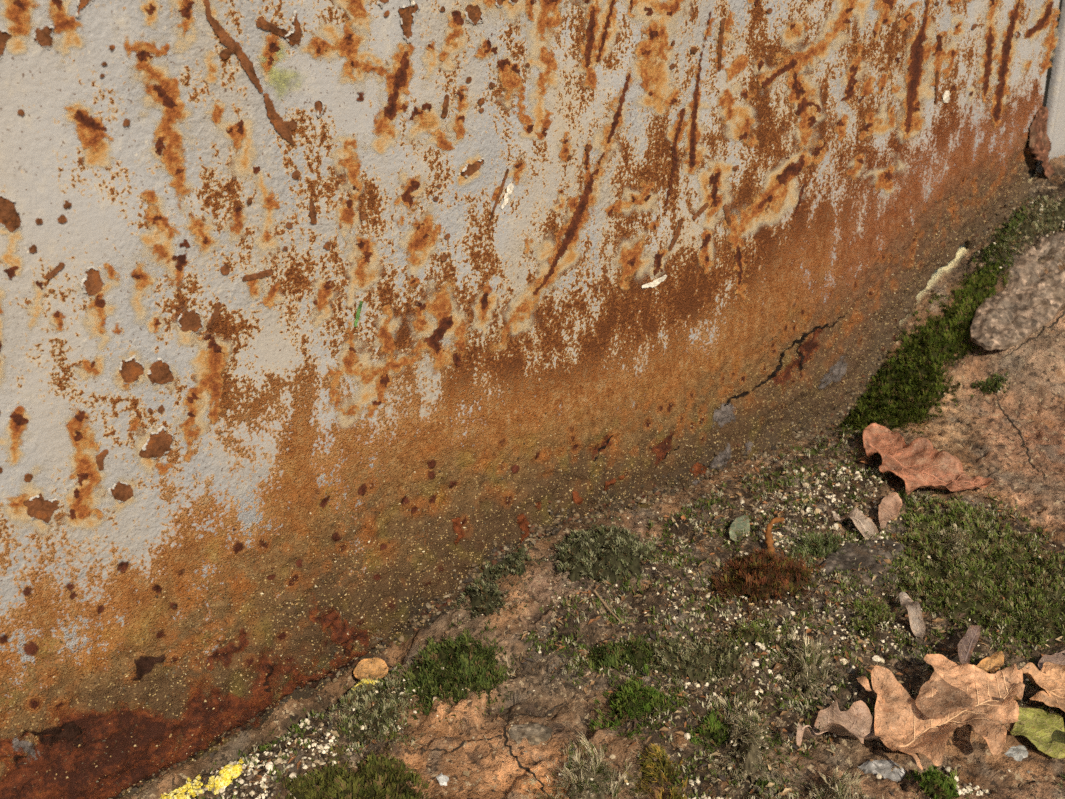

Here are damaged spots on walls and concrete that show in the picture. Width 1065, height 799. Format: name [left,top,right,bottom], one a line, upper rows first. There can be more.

peeling [0,30,12,57]
corrosion [0,0,84,62]
peeling [33,25,55,49]
peeling [75,0,92,18]
corrosion [64,101,113,167]
corrosion [300,0,562,307]
corrosion [715,0,978,151]
corrosion [75,0,293,475]
corrosion [327,172,499,428]
crack [724,313,850,406]
corrosion [0,406,136,533]
corrosion [0,601,382,799]